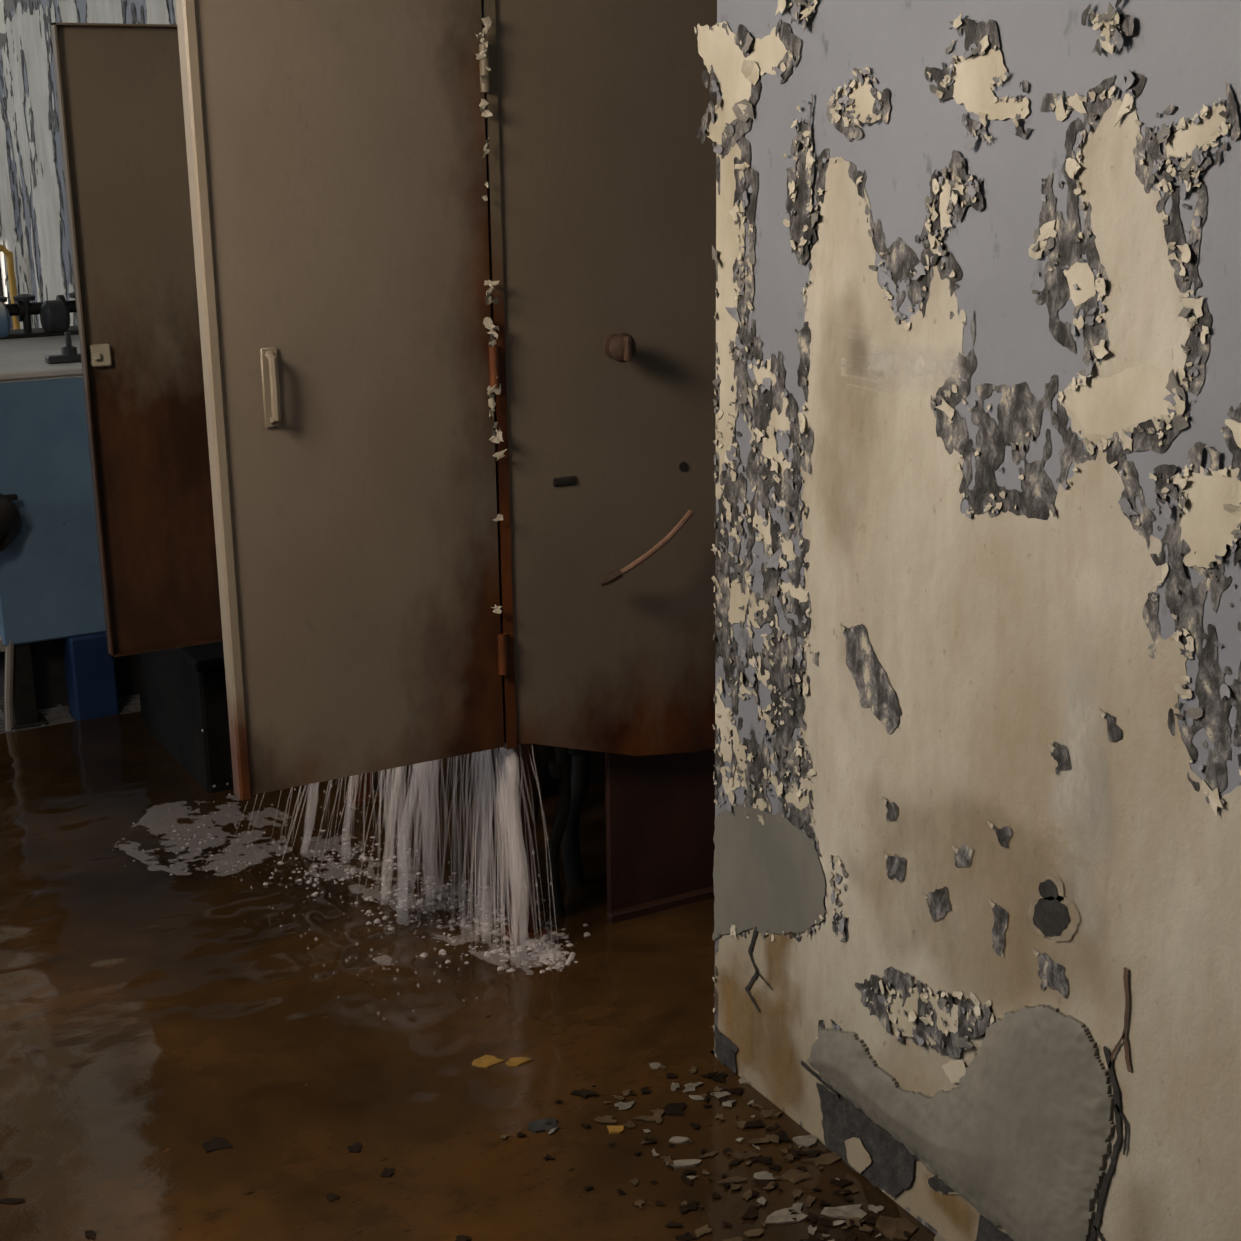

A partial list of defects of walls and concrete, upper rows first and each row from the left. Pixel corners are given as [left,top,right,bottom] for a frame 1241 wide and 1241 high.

peeling [0,0,177,330]
peeling [694,0,1241,1241]
crack [745,926,772,1013]
crack [1088,967,1131,1241]